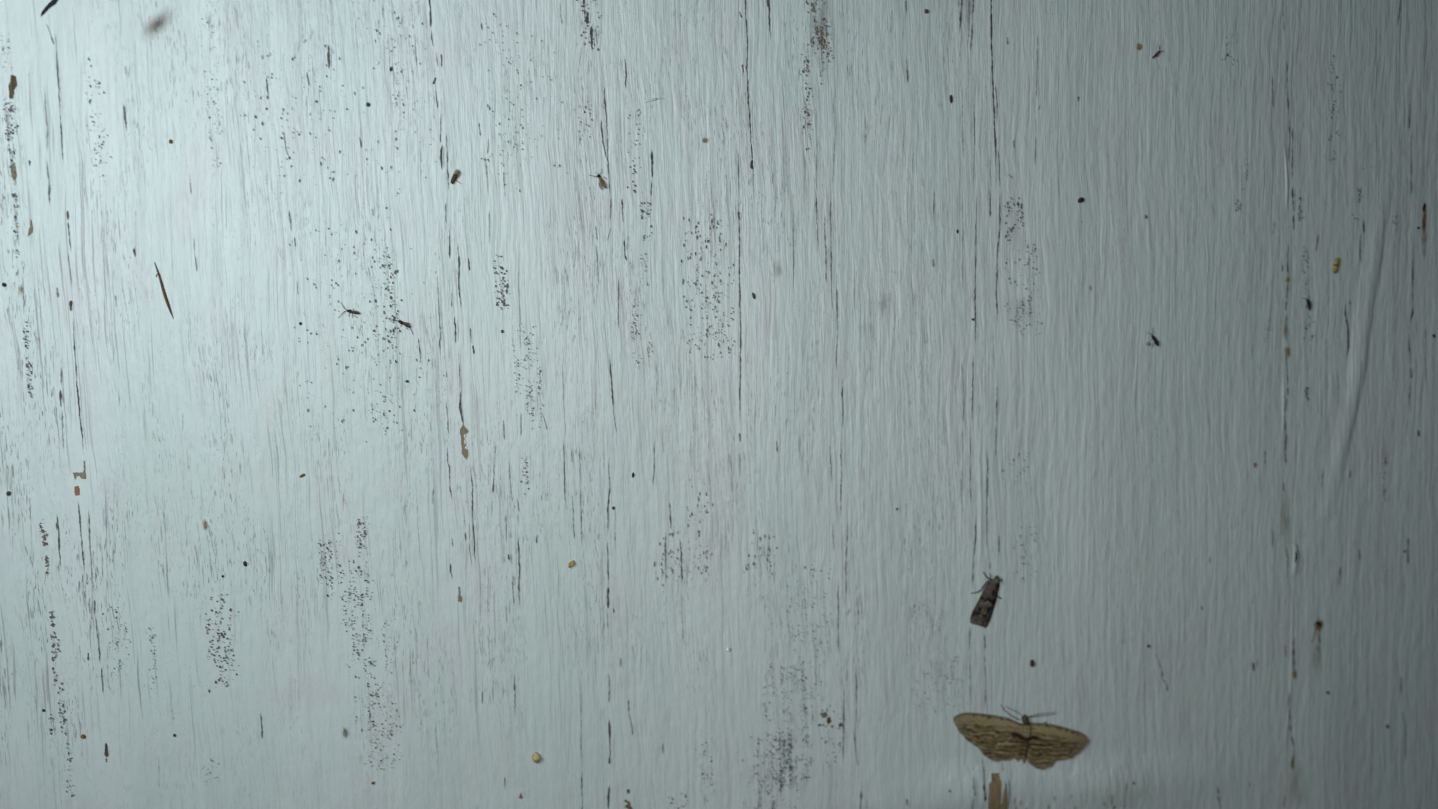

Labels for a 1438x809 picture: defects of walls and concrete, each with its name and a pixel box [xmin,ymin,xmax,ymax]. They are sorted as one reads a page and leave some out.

peeling [800,0,832,150]
peeling [988,772,1008,809]